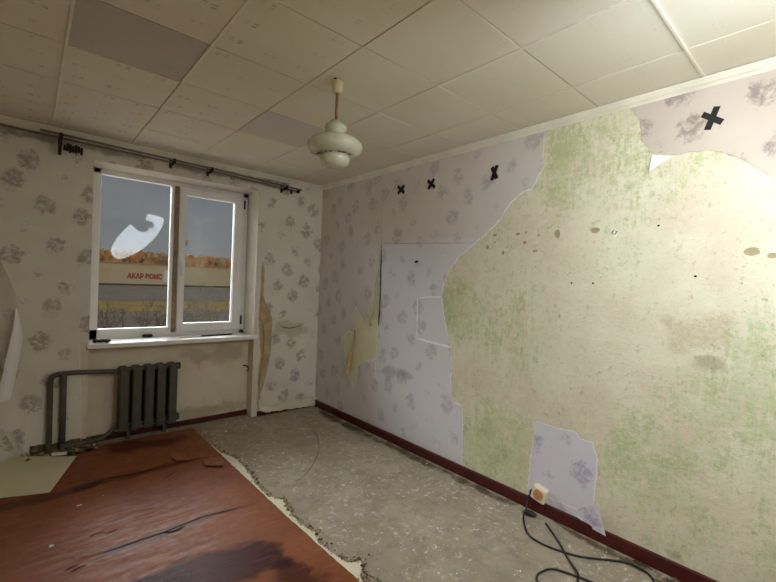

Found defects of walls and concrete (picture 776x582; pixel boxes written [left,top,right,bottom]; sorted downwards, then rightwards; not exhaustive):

peeling [251,261,273,411]
peeling [442,109,776,582]
leakage [132,541,293,582]